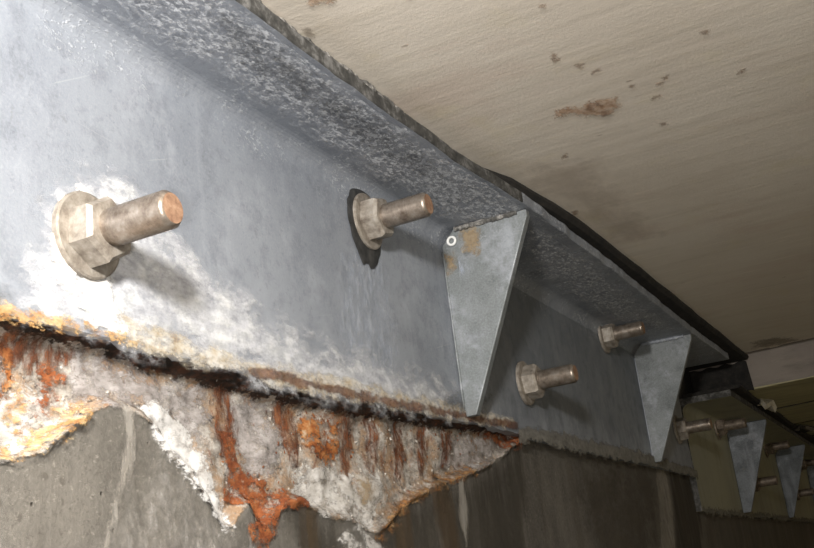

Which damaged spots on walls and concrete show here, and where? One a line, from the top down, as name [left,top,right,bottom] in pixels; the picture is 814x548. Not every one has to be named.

rust [0,300,138,348]
rust [209,384,310,548]
spalling [0,326,529,548]
rust [249,368,518,429]